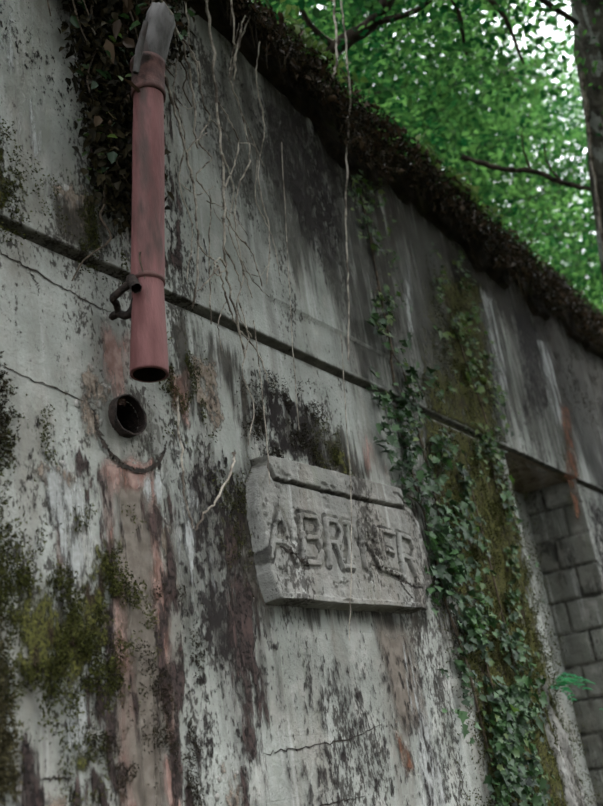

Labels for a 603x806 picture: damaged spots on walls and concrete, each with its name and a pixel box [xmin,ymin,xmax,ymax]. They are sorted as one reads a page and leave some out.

crack [0,250,111,312]
crack [1,365,167,474]
leakage [240,369,250,421]
corrosion [557,403,580,518]
leakage [224,513,270,806]
crack [262,724,380,772]
leakage [372,612,445,806]